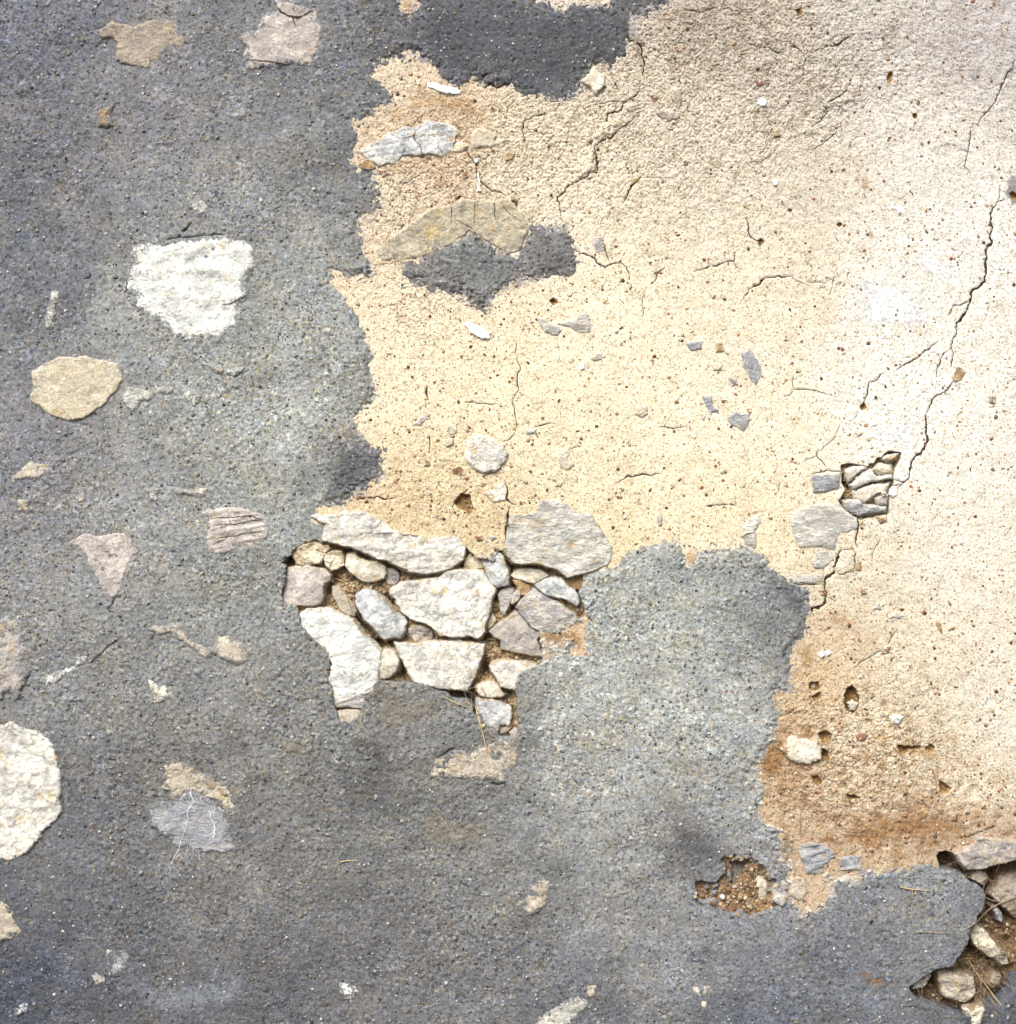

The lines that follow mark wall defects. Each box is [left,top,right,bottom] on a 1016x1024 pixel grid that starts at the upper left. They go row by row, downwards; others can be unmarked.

crack [557,10,646,216]
crack [694,214,834,301]
crack [794,187,1004,617]
spalling [453,493,474,515]
spalling [839,451,900,518]
spalling [317,562,451,648]
spalling [501,551,564,587]
spalling [451,635,542,736]
spalling [843,685,859,714]
spalling [818,730,832,763]
spalling [696,858,776,915]
spalling [951,861,1016,1000]